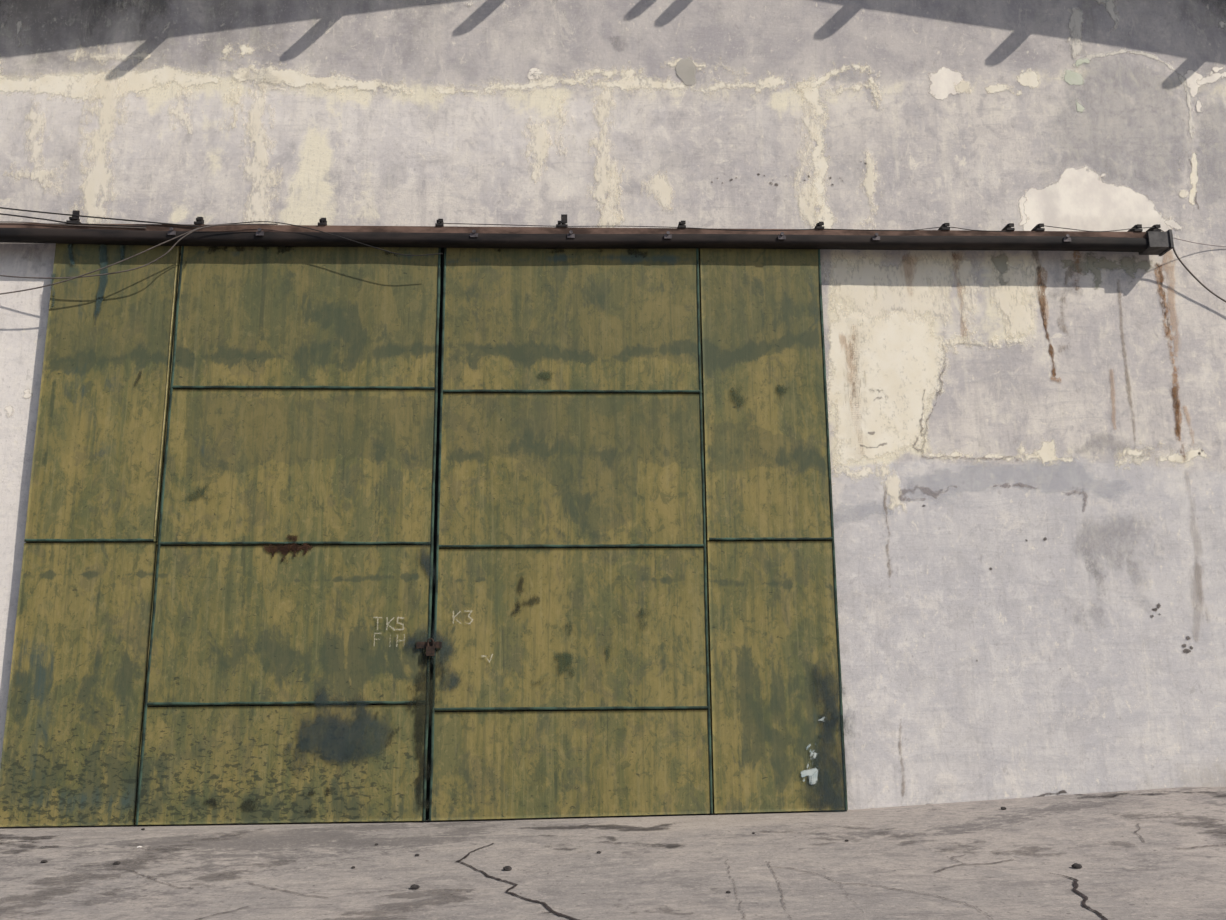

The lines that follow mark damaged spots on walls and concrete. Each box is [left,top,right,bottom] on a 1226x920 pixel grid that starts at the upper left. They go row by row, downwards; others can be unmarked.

leakage [1068,7,1083,58]
peeling [928,67,1039,100]
peeling [1184,67,1226,112]
peeling [1019,165,1182,232]
peeling [826,256,1073,509]
rust [1036,267,1061,381]
rust [1155,263,1182,440]
rust [264,535,313,561]
crack [456,843,580,920]
crack [768,855,1014,917]
crack [1052,873,1108,920]